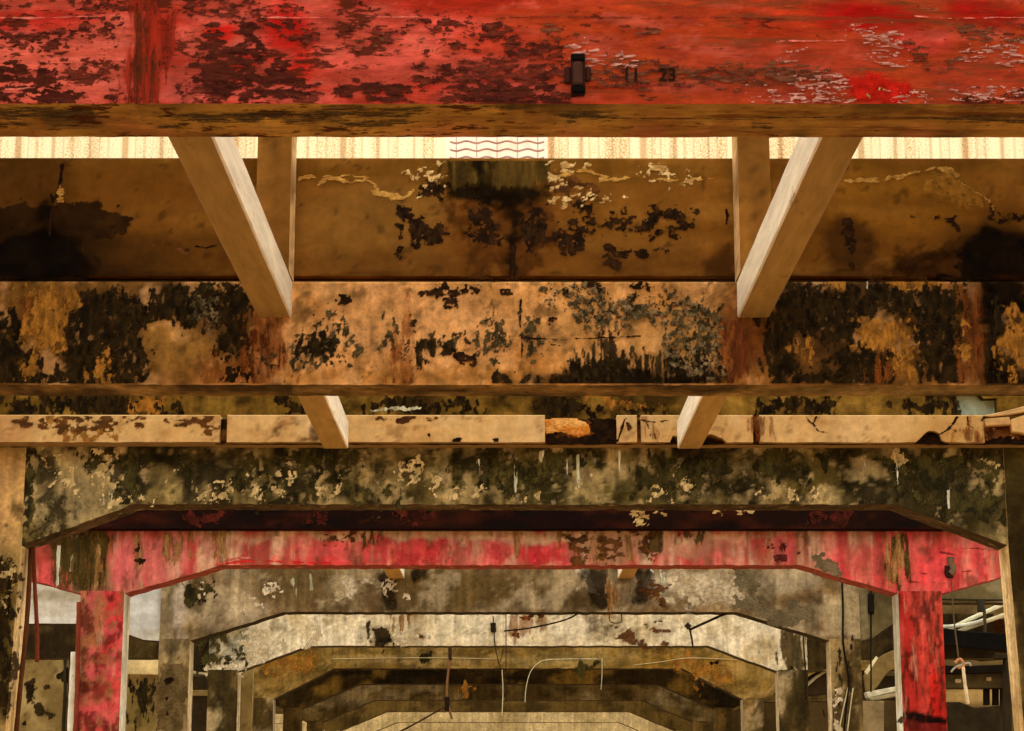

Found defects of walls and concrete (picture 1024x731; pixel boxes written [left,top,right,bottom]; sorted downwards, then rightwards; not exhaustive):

peeling [0,0,128,103]
peeling [175,0,856,103]
peeling [845,22,1024,74]
peeling [298,174,414,201]
leakage [394,160,713,281]
leakage [0,198,364,509]
leakage [552,328,730,383]
corrosion [954,299,1024,383]
leakage [361,395,487,415]
spalling [545,418,632,444]
crack [936,416,984,436]
leakage [393,454,487,503]